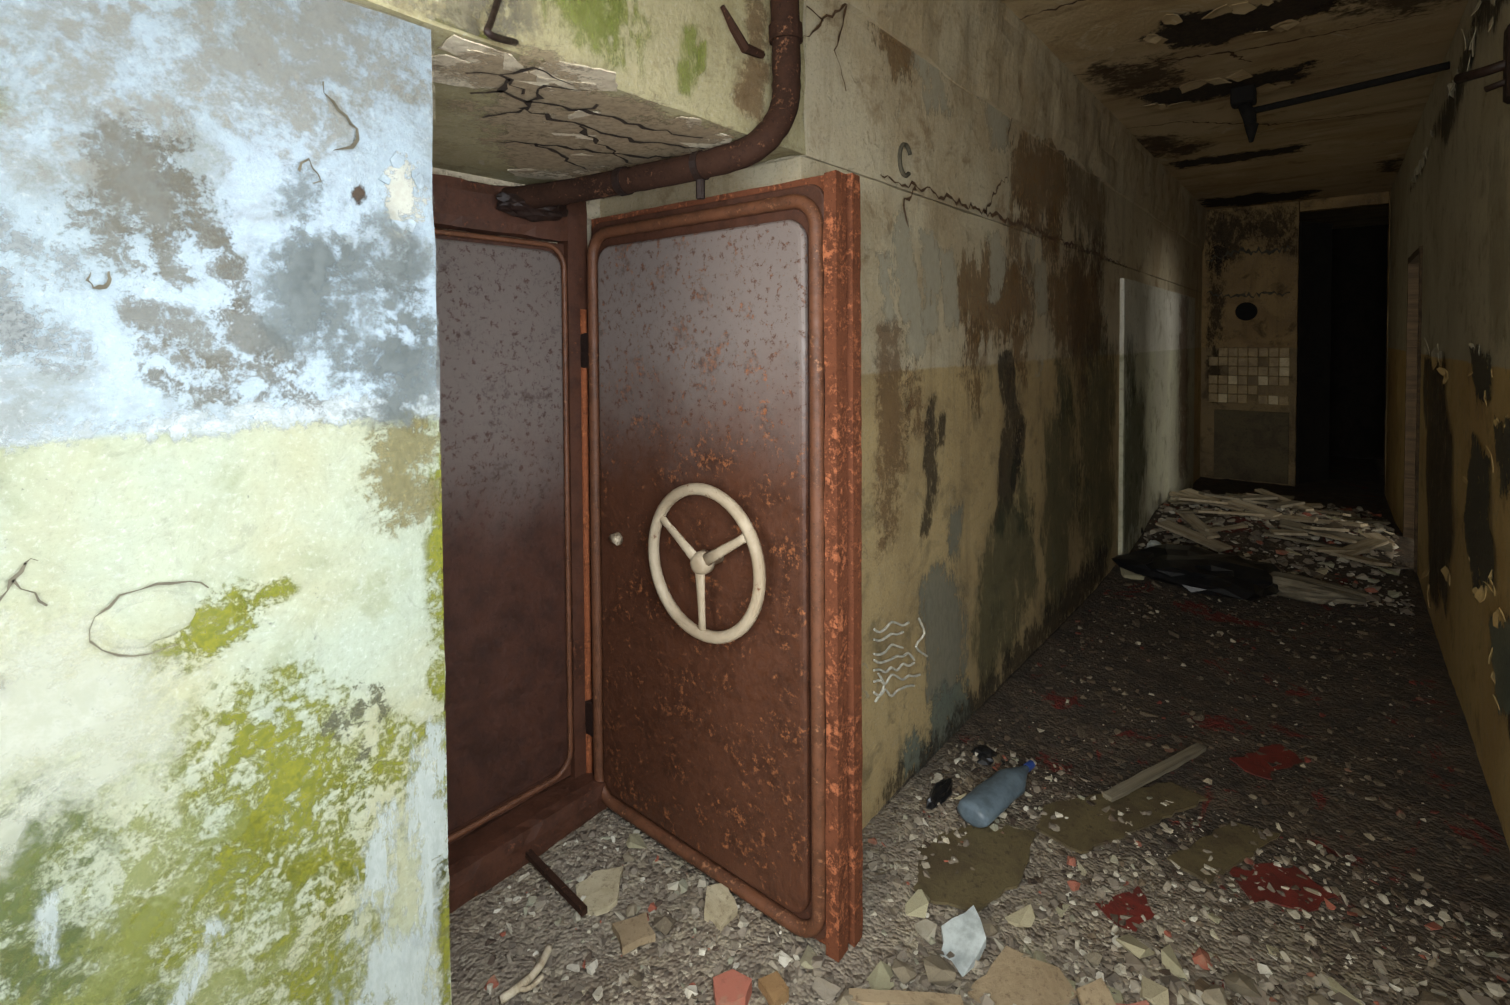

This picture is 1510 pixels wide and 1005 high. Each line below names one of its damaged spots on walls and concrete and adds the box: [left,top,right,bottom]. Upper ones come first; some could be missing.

spalling [1139,0,1345,49]
crack [465,67,704,169]
spalling [1136,60,1318,110]
spalling [1167,143,1307,169]
peeling [1410,0,1502,192]
water stain [0,120,442,535]
water stain [878,133,1136,804]
peeling [1421,339,1510,717]
crack [0,558,48,606]
crack [89,581,209,657]
water stain [237,577,297,616]
water stain [0,679,451,1005]